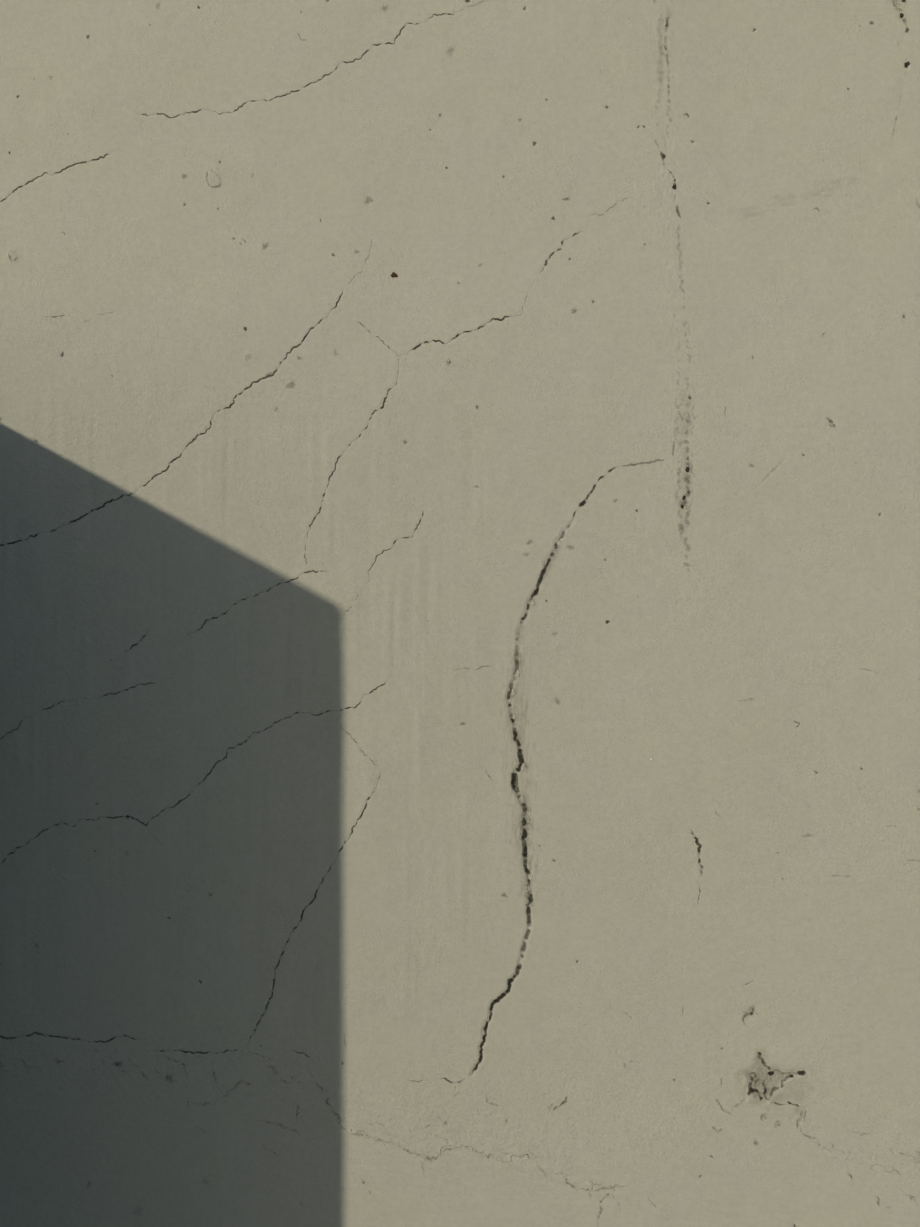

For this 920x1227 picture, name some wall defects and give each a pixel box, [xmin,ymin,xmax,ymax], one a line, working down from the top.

crack [1,154,107,202]
crack [413,316,508,350]
crack [0,295,341,546]
crack [573,469,611,515]
crack [446,544,557,1083]
crack [162,879,323,1054]
spalling [748,1052,808,1106]